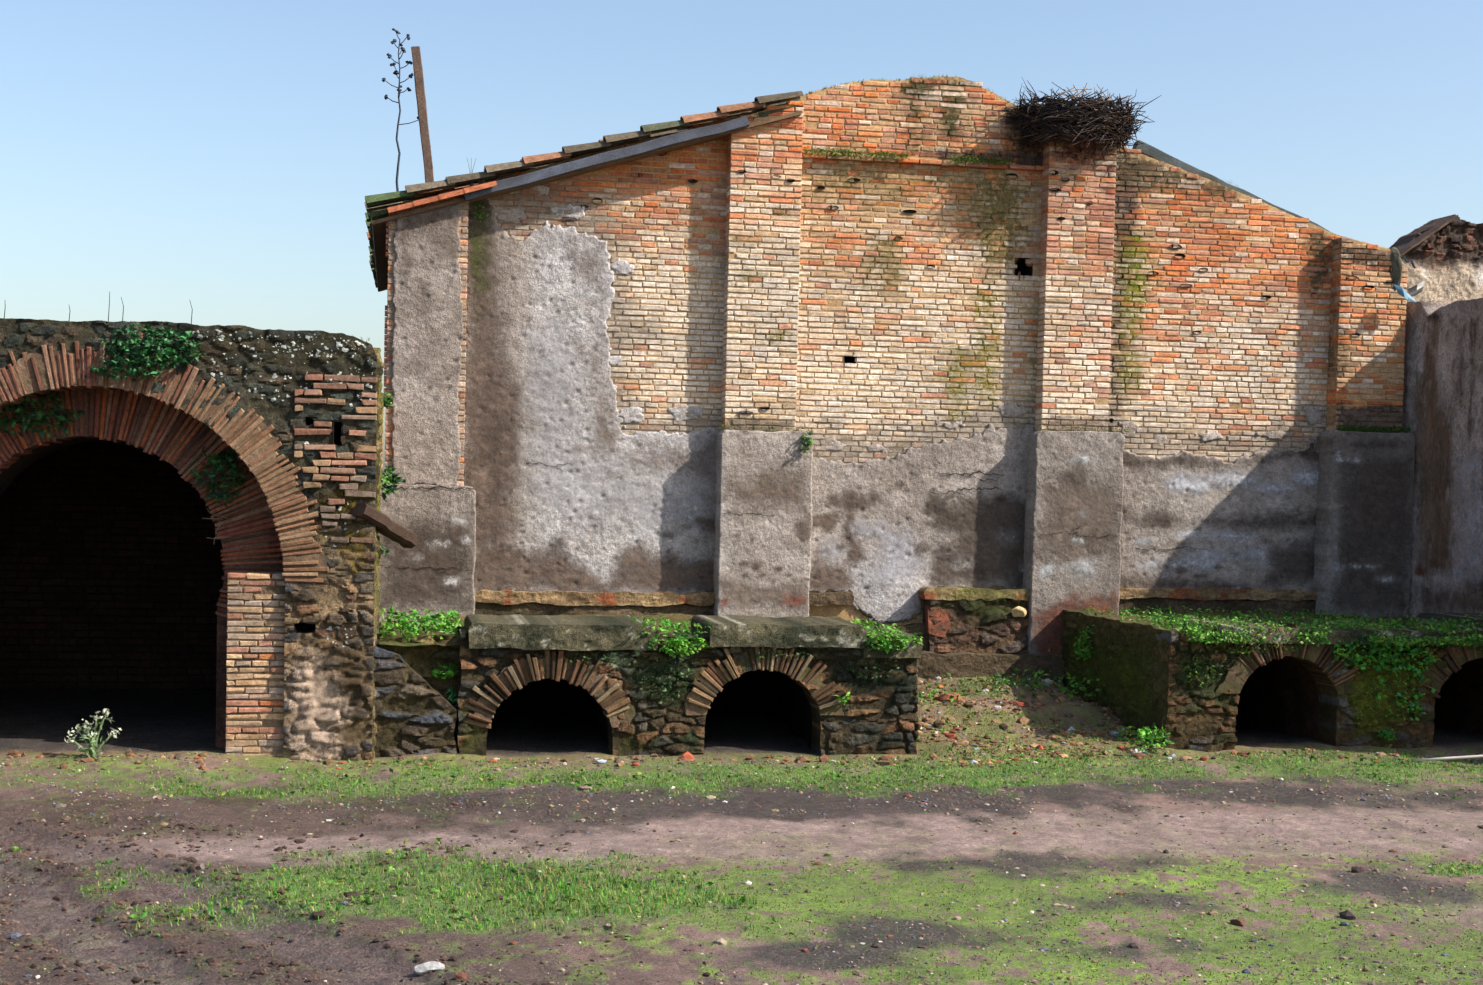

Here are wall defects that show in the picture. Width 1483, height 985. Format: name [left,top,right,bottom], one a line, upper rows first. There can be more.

flaking render [490,120,770,435]
damp [380,201,1316,608]
damp [1043,138,1236,432]
damp [1123,318,1483,613]
damp [1309,231,1393,294]